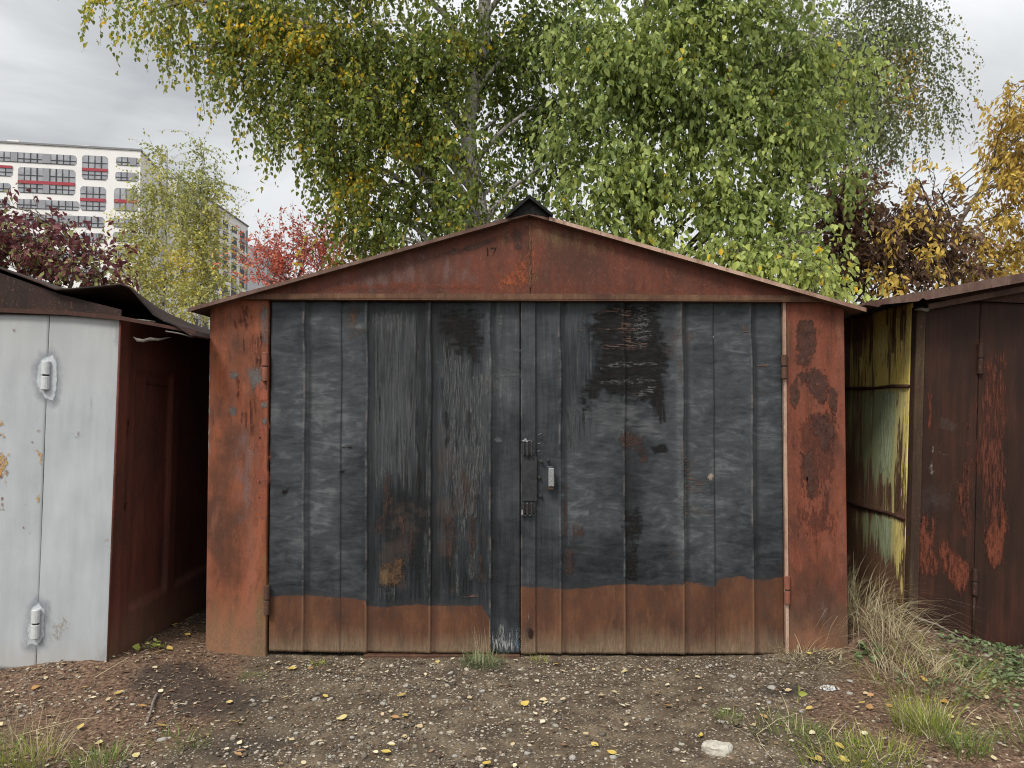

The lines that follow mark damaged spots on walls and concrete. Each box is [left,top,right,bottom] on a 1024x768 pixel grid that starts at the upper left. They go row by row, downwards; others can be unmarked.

peeling [581,304,669,416]
peeling [966,353,1009,569]
peeling [919,516,969,592]